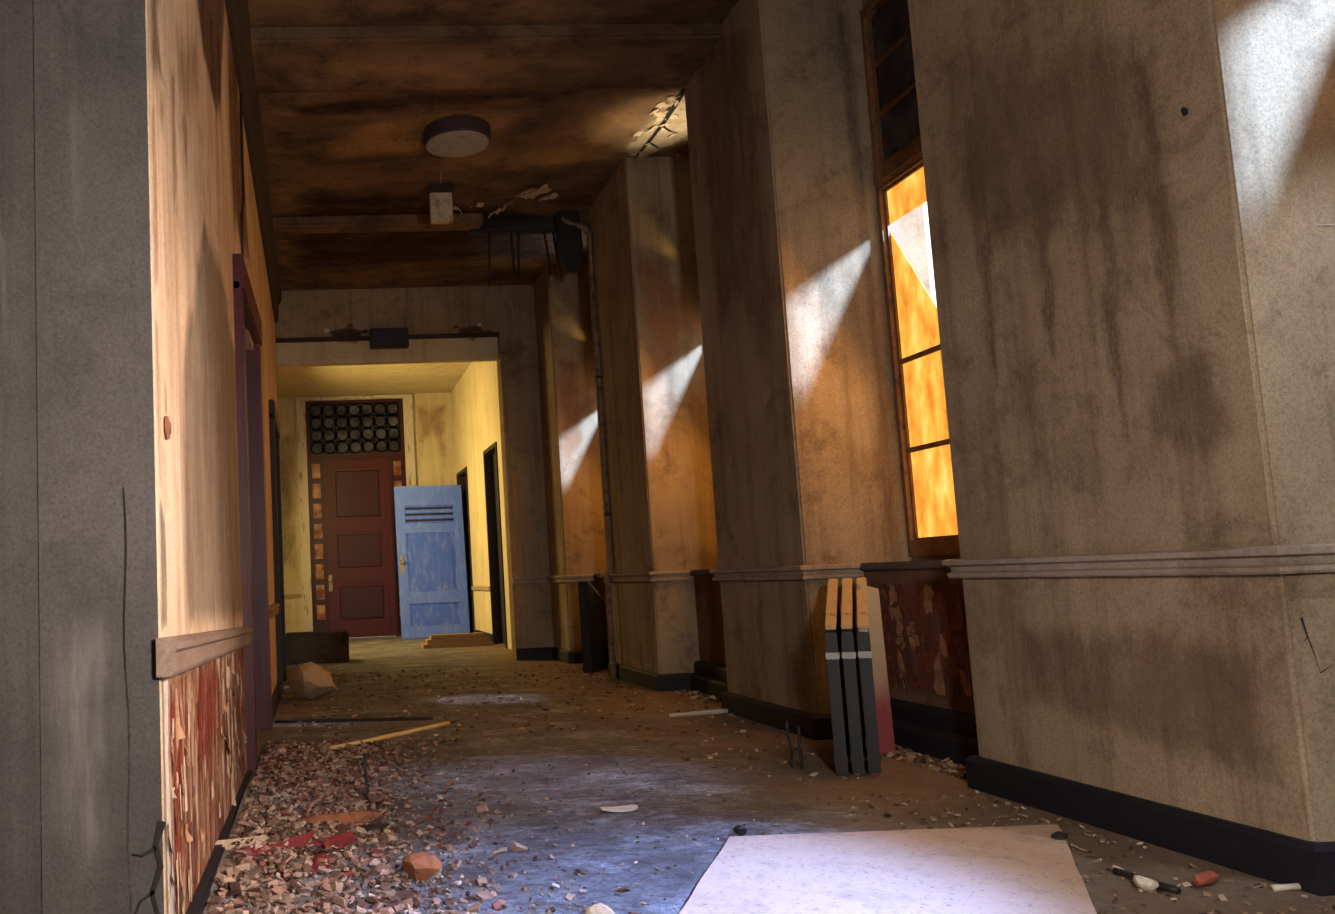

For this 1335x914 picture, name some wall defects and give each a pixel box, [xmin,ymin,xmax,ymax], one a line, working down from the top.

peeling [627,94,687,158]
crack [123,487,176,914]
peeling [163,647,268,914]